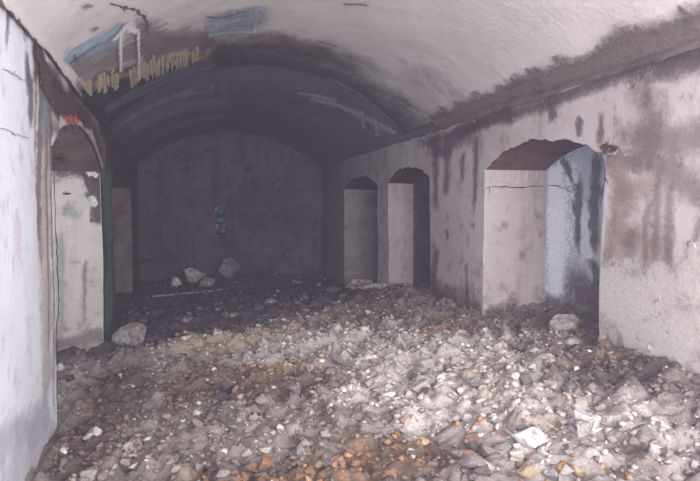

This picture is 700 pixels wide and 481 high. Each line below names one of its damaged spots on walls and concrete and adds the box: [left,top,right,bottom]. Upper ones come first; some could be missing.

damp [104,34,426,144]
crack [486,185,571,196]
damp [425,47,700,207]
damp [545,114,604,317]
spalling [597,140,618,157]